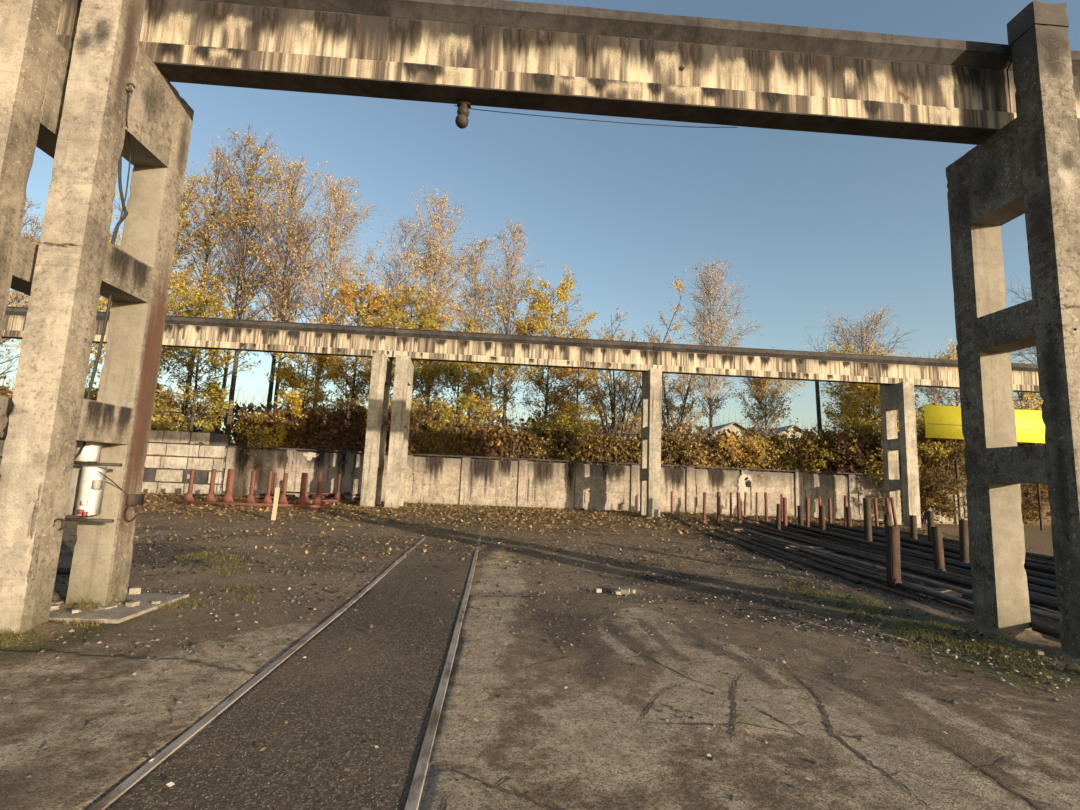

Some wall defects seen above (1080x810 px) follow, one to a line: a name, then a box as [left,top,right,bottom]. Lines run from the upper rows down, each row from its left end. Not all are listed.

water stain [403,25,490,76]
water stain [563,34,702,70]
water stain [533,73,553,87]
water stain [570,78,723,97]
water stain [723,49,931,88]
water stain [864,100,880,113]
rust [121,302,164,522]
water stain [278,450,324,466]
water stain [471,459,511,485]
water stain [534,462,574,485]
water stain [710,469,724,488]
crack [619,642,934,810]